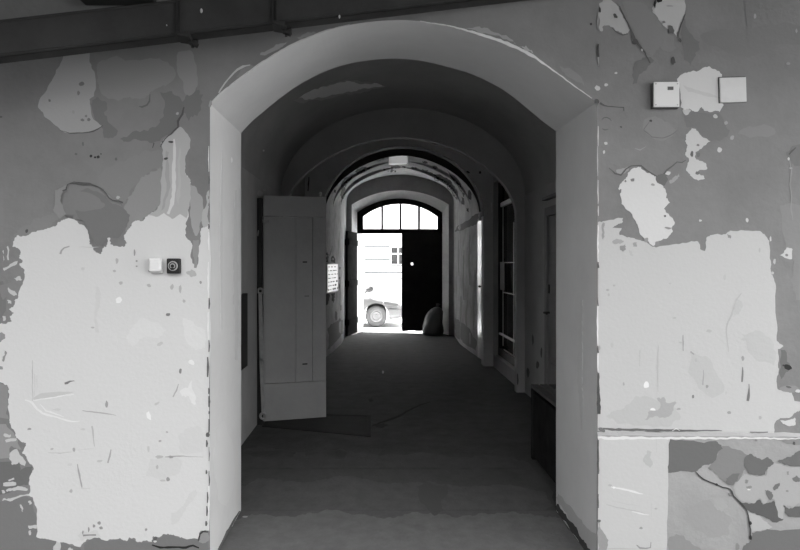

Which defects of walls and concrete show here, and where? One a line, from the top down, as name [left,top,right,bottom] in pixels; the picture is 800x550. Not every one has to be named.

peeling [597,0,643,51]
peeling [652,0,686,37]
flaking render [38,53,101,133]
peeling [677,66,728,125]
flaking render [0,176,211,550]
flaking render [597,128,800,550]
crack [603,426,722,434]
crack [696,472,751,535]